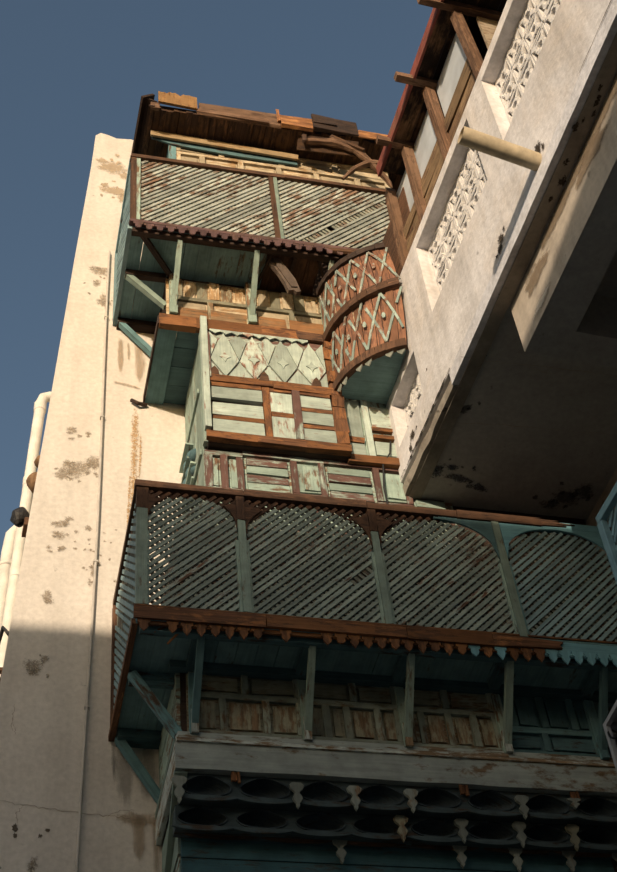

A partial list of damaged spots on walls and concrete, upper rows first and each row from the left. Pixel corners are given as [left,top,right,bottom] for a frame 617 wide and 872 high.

water stain [525,74,617,296]
water stain [55,457,99,482]
rust [127,409,142,523]